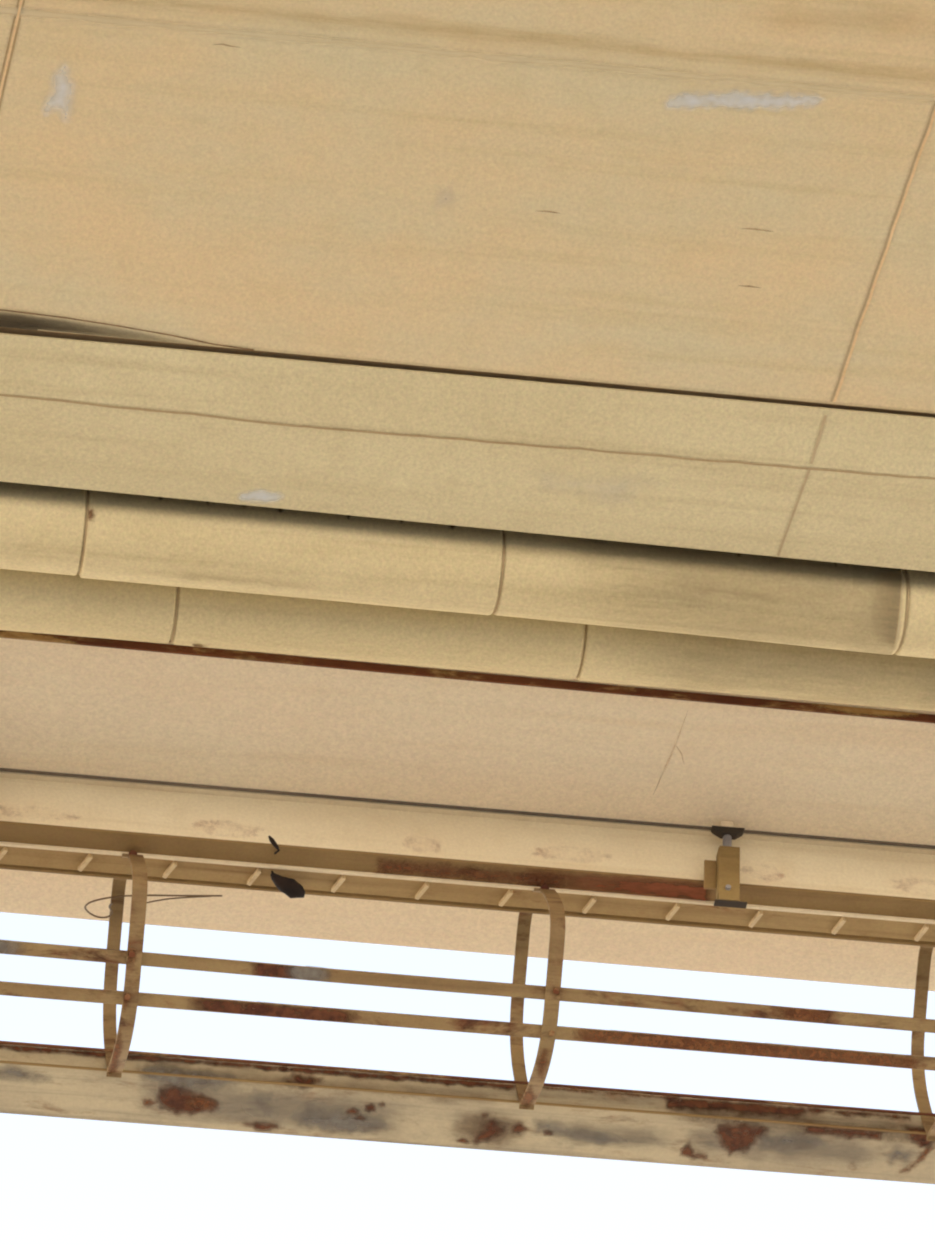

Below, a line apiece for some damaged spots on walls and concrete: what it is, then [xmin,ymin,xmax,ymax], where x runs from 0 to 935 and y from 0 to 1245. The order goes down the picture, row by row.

peeling [671,95,817,107]
leakage [0,309,254,351]
crack [653,711,688,794]
corrosion [0,1035,933,1172]